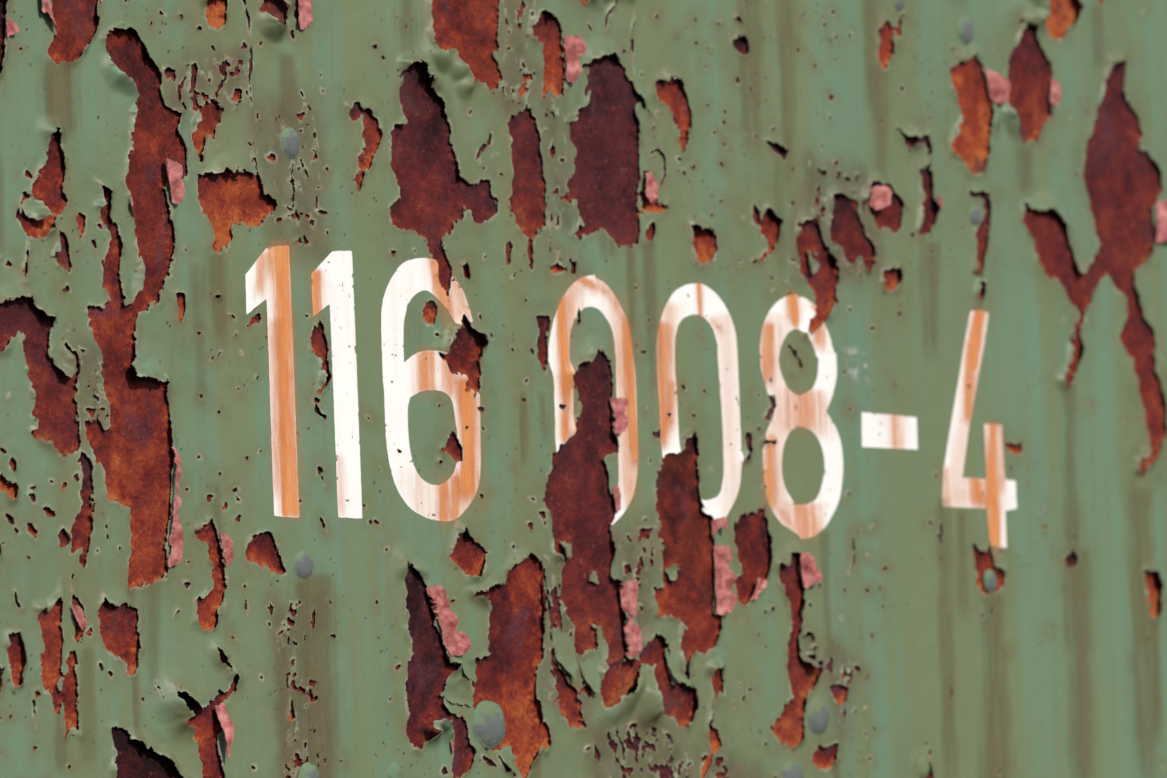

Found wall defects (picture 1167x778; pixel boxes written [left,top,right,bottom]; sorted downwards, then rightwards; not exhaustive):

peeling [349,0,692,336]
peeling [0,0,319,631]
rust [259,245,299,517]
rust [419,351,484,521]
rust [557,298,573,440]
peeling [395,350,860,778]
rust [624,318,651,463]
rust [965,311,985,419]
rust [970,425,1011,547]
peeling [1022,60,1167,476]
peeling [35,594,141,738]
peeling [111,726,183,778]